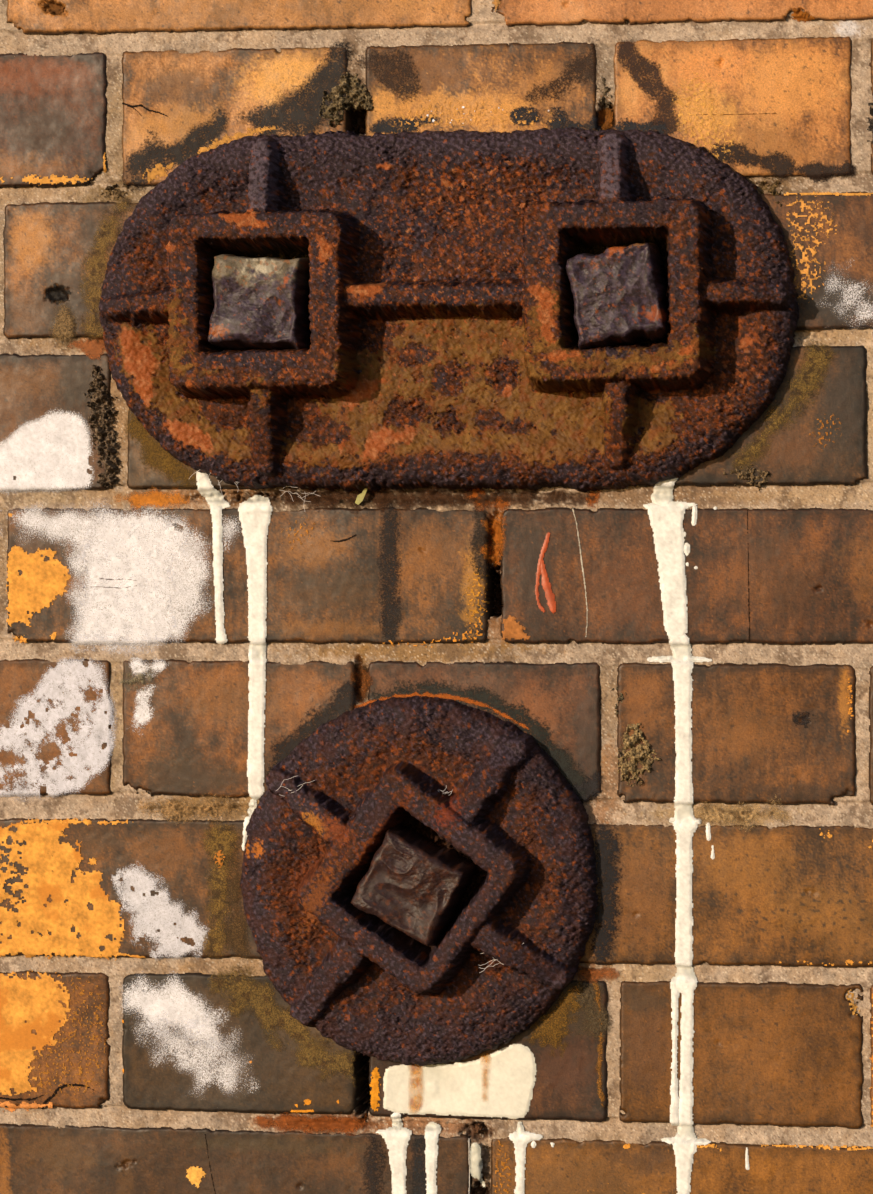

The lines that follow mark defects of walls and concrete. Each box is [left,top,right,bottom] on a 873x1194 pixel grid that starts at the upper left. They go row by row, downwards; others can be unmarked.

rust [351,661,528,730]
peeling [0,818,145,961]